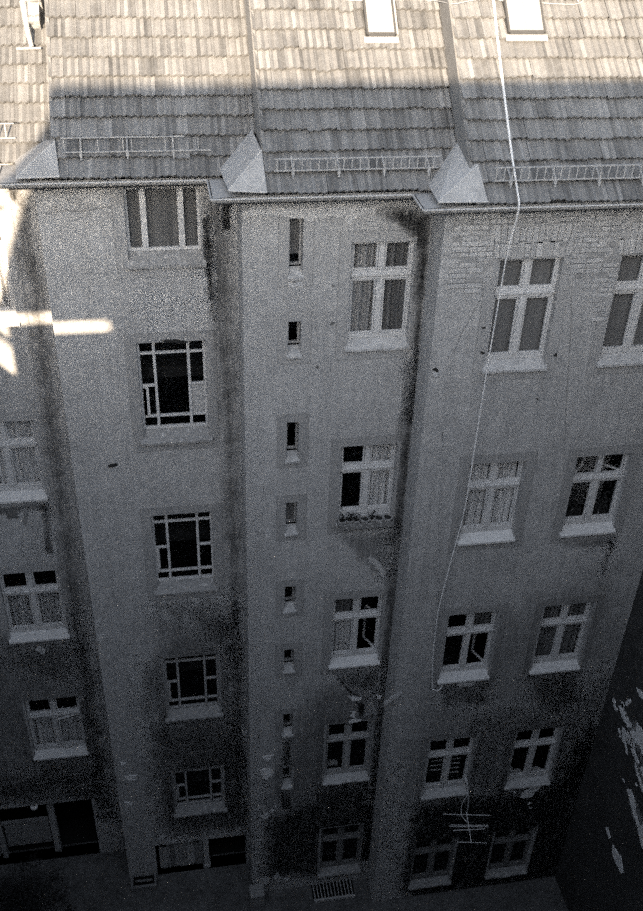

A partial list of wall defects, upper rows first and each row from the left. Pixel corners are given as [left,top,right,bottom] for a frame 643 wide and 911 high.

damp [202,204,230,304]
damp [386,210,430,359]
damp [393,371,417,555]
damp [364,571,397,857]
peeling [612,688,643,849]
peeling [605,827,623,873]